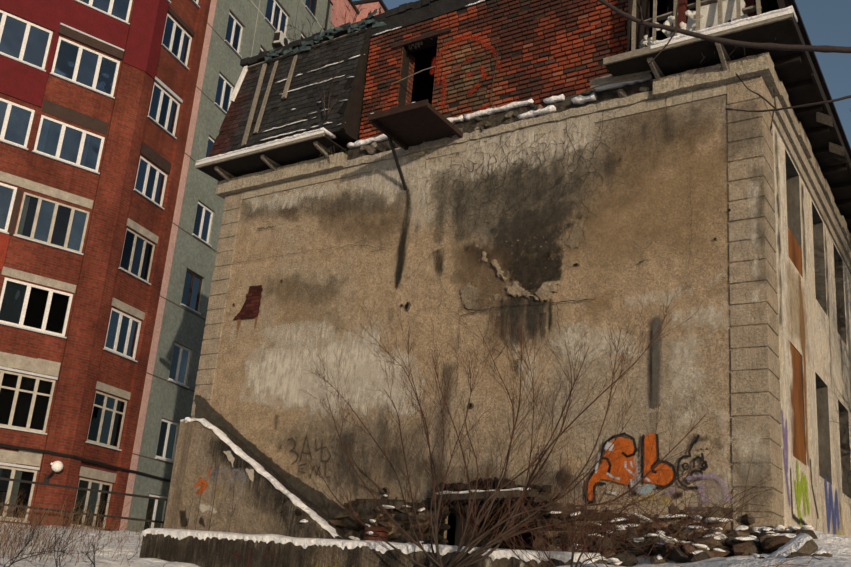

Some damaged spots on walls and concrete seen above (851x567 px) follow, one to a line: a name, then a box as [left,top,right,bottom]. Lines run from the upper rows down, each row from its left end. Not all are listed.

water stain [251,186,334,215]
crack [409,105,635,240]
water stain [360,120,593,381]
spalling [233,285,263,320]
crack [455,299,594,392]
efflorescence [560,326,635,361]